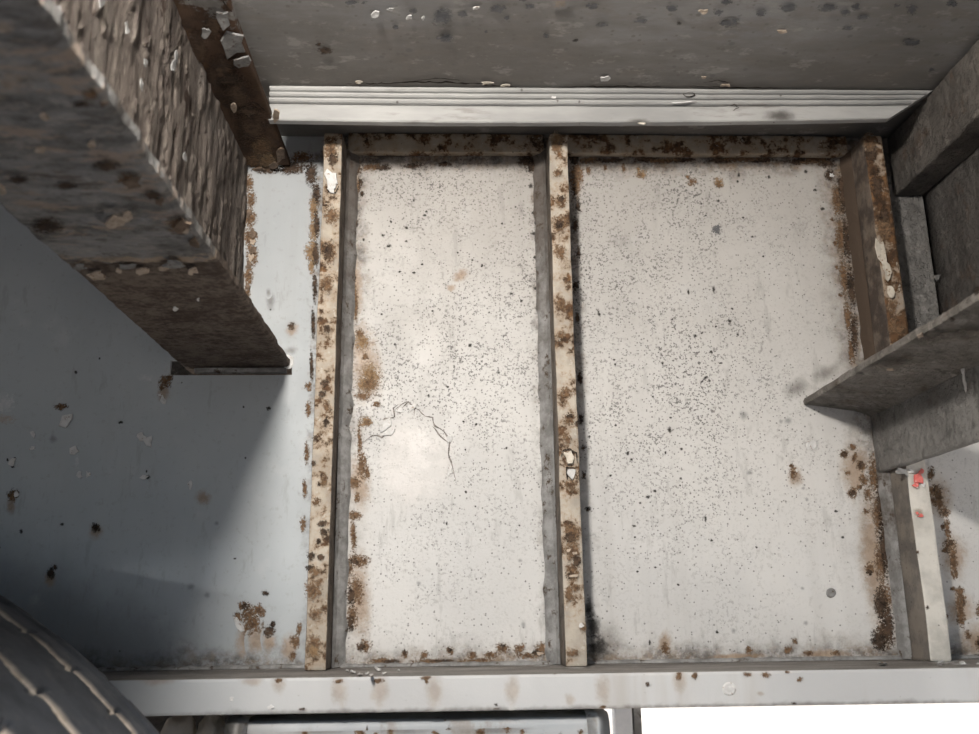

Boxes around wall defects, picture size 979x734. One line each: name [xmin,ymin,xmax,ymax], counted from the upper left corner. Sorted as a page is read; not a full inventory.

peeling [191,0,274,158]
corrosion [243,140,339,340]
corrosion [550,130,696,231]
corrosion [232,516,329,665]
corrosion [302,474,328,506]
corrosion [304,350,330,427]
corrosion [346,249,545,664]
corrosion [560,371,583,398]
corrosion [563,523,581,602]
corrosion [562,411,587,451]
corrosion [835,434,896,656]
corrosion [927,465,979,655]